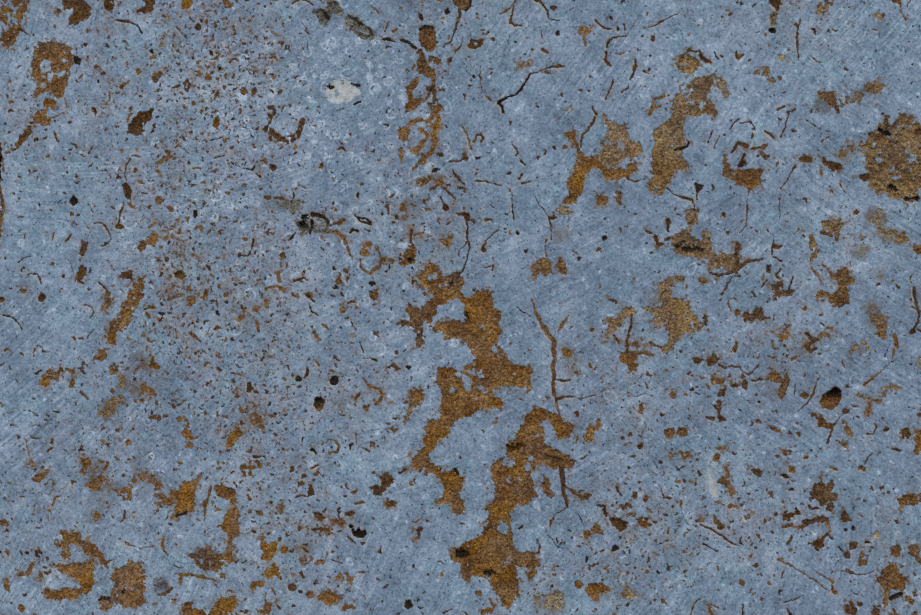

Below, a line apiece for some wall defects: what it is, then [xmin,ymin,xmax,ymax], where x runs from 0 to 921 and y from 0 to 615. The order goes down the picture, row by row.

spalling [0,0,30,48]
spalling [0,41,89,238]
spalling [537,49,730,215]
spalling [818,80,885,114]
spalling [799,113,921,203]
spalling [532,257,567,281]
spalling [34,265,237,449]
spalling [70,164,534,615]
spalling [601,276,709,374]
spalling [687,352,741,423]
spalling [438,406,683,615]
spalling [3,530,148,612]